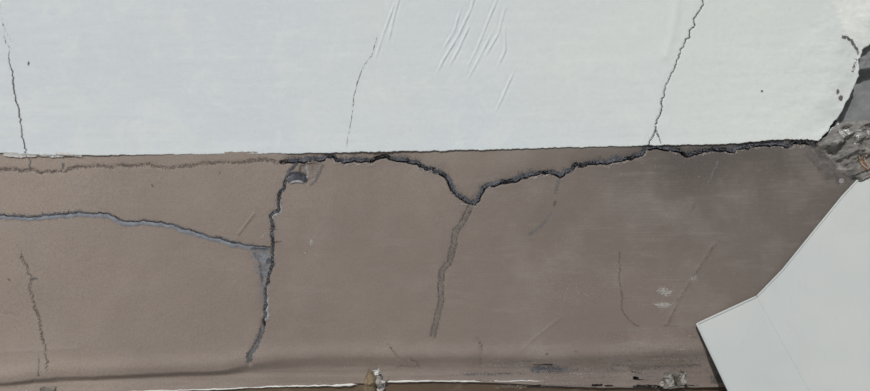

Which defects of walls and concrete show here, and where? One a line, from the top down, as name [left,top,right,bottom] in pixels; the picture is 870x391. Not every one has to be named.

crack [666,1,704,84]
spalling [803,0,870,195]
crack [0,46,839,362]